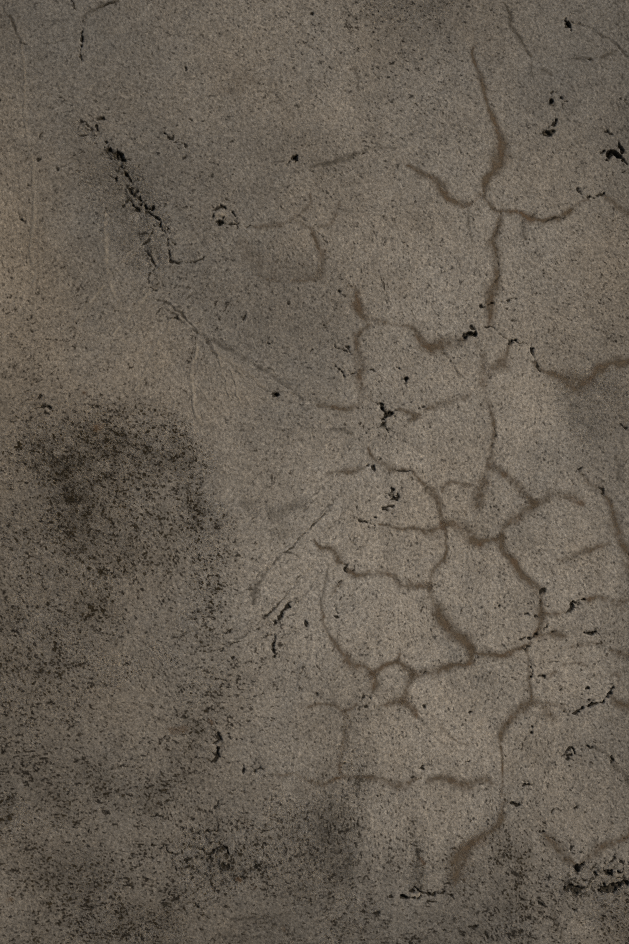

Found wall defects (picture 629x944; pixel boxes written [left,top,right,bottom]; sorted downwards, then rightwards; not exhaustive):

crack [406,165,469,222]
crack [471,47,629,391]
crack [157,300,217,356]
crack [352,292,385,385]
crack [411,327,465,352]
crack [403,406,432,420]
crack [313,539,367,577]
crack [323,448,603,717]
crack [568,487,629,567]
crack [324,676,629,788]
crack [451,809,504,885]
crack [539,831,629,874]